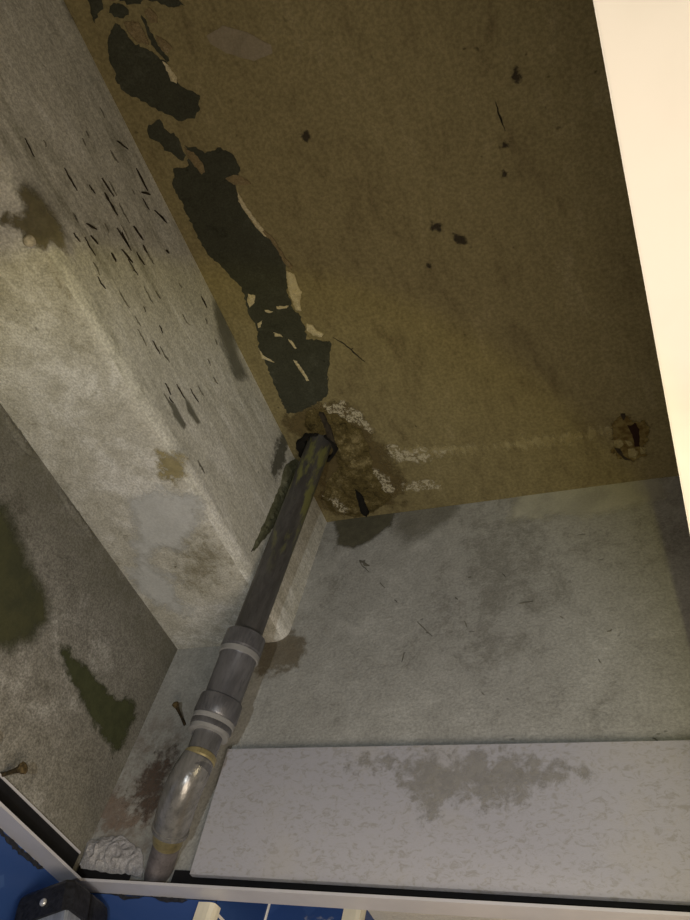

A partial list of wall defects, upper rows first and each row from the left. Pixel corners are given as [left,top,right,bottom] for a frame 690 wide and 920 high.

peeling [88,0,405,517]
leakage [0,506,47,651]
rust [101,745,177,831]